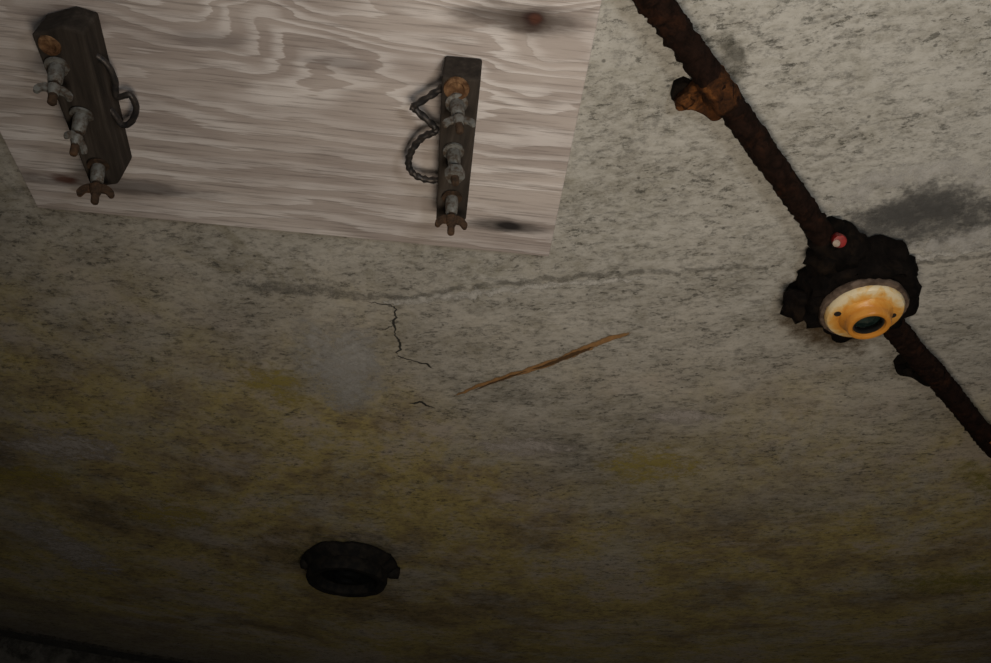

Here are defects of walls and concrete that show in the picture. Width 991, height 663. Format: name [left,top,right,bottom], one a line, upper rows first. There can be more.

damp [838,160,991,252]
crack [914,245,991,261]
crack [370,277,643,368]
rust [456,333,629,395]